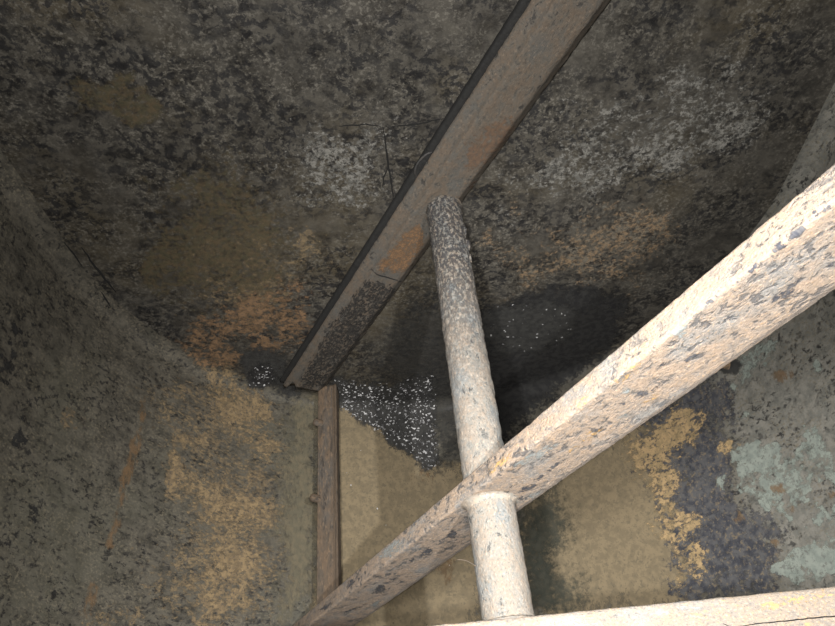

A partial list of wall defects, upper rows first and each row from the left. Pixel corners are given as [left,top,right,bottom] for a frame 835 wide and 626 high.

corrosion [379,224,424,273]
corrosion [339,408,463,584]
corrosion [355,544,481,626]
crack [723,616,835,626]